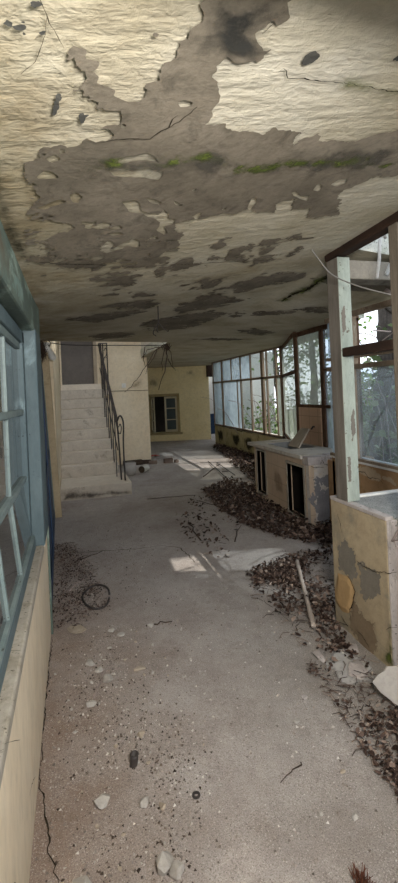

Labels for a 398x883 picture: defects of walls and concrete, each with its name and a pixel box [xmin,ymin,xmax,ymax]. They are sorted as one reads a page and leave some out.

peeling [3,20,26,35]
crack [21,0,63,74]
damp [218,10,262,57]
crack [283,68,398,92]
crack [100,107,197,143]
flaking render [23,0,398,341]
damp [305,150,388,171]
peeling [308,472,330,523]
flaking render [337,540,381,654]
crack [31,643,59,883]